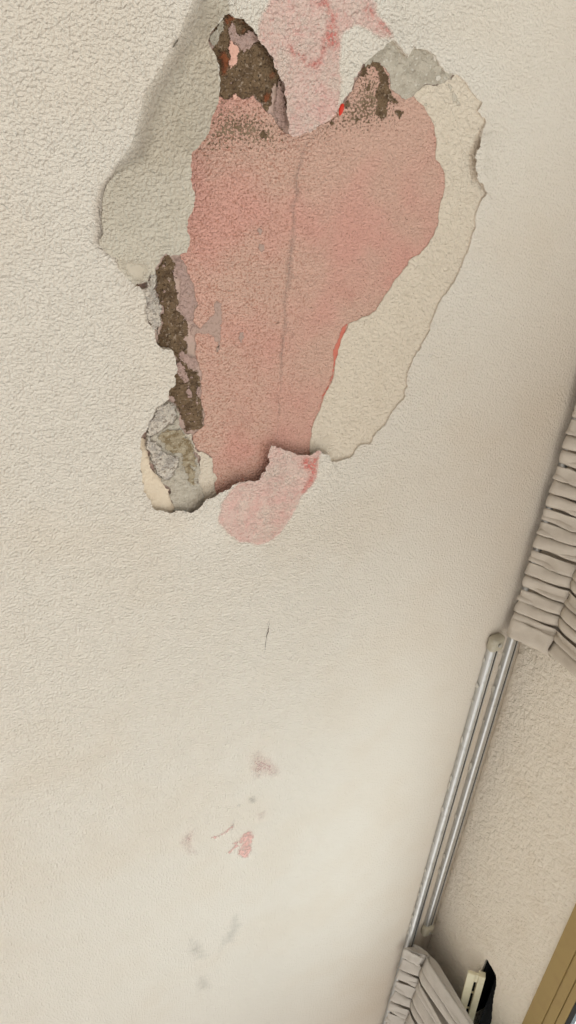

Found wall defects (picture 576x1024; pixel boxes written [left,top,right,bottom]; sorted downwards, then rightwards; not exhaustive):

flaking render [138,0,486,552]